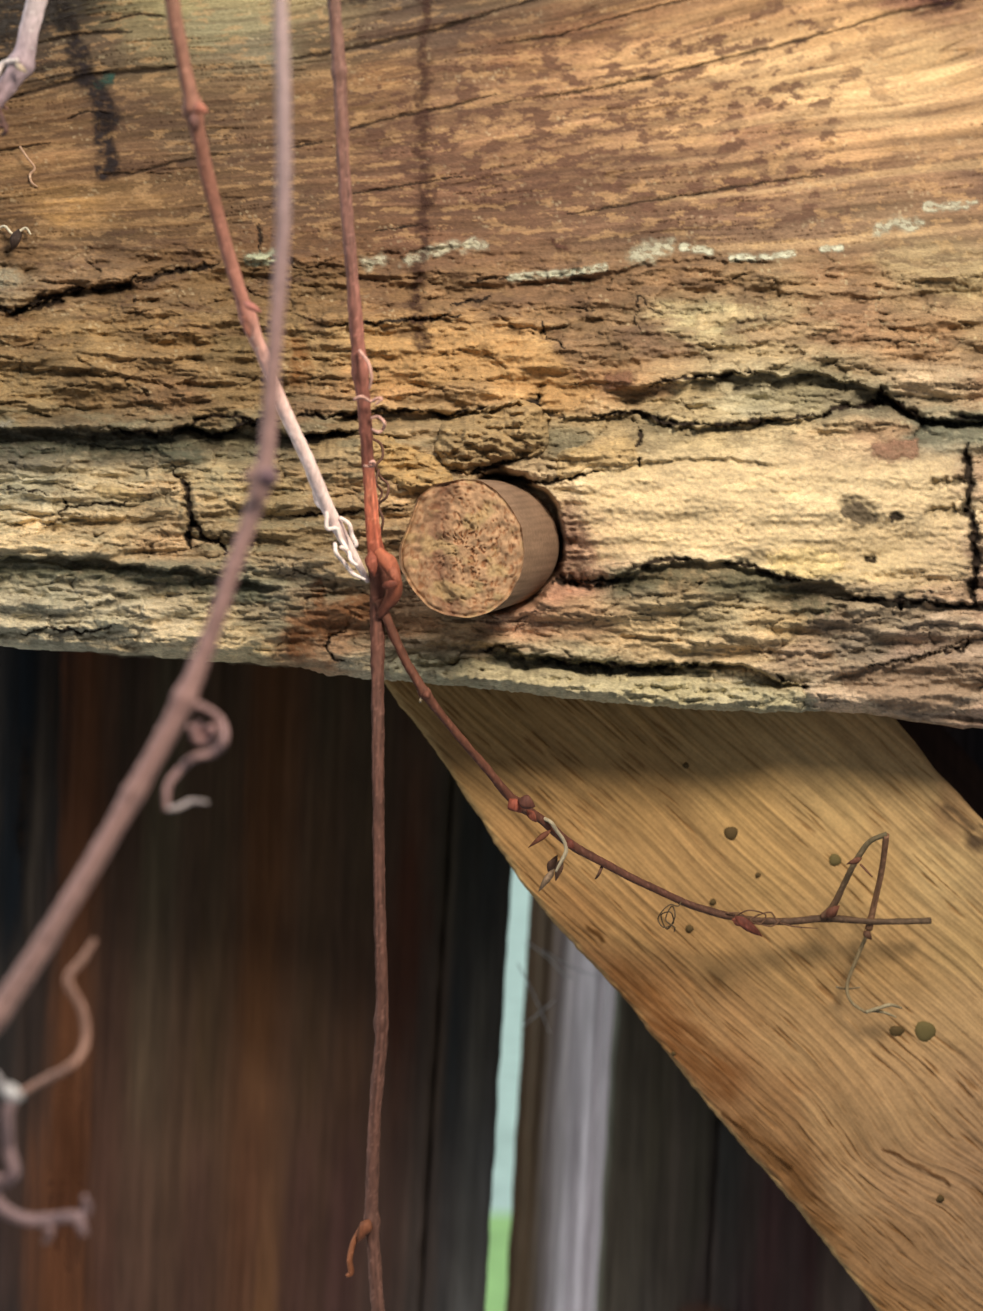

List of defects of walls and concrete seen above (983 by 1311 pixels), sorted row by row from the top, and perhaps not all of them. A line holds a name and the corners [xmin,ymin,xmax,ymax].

water stain [0,0,26,38]
water stain [40,0,119,180]
crack [0,263,219,317]
crack [113,406,486,552]
crack [526,371,983,667]
crack [484,644,699,670]